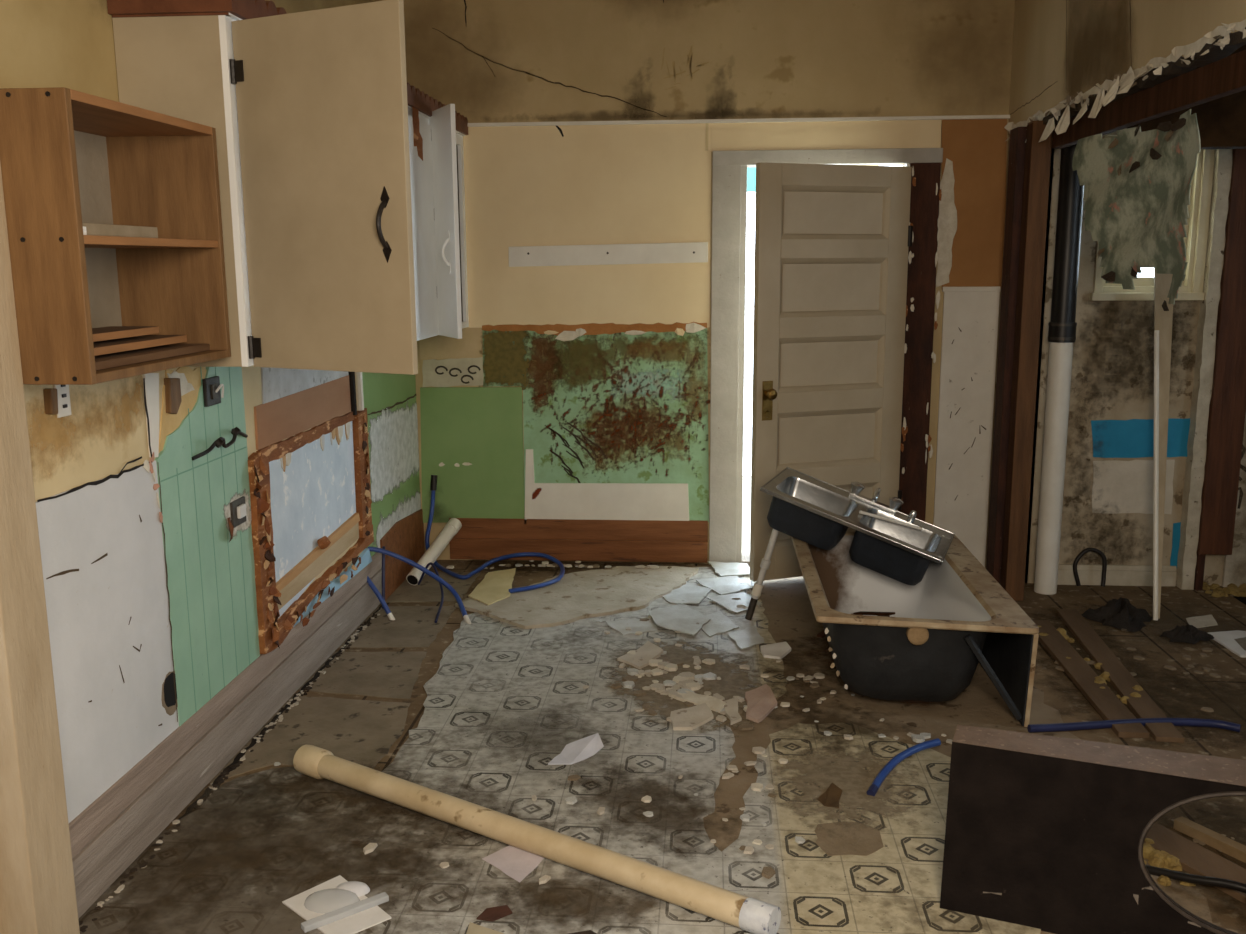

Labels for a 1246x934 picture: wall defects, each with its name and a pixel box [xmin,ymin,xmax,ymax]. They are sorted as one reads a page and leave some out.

crack [433,0,667,117]
spalling [1004,19,1246,143]
leakage [1082,301,1154,397]
leakage [1169,305,1193,392]
leakage [28,382,141,464]
peeling [320,403,421,548]
peeling [224,453,361,648]